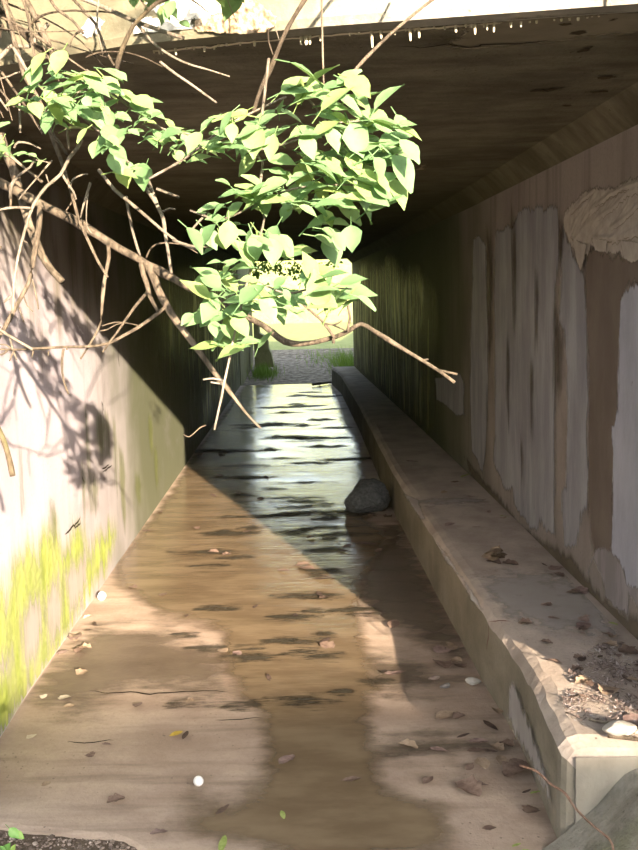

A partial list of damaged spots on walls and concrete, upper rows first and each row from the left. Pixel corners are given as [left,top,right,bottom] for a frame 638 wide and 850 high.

crack [402,40,547,48]
peeling [435,177,638,548]
peeling [588,284,638,613]